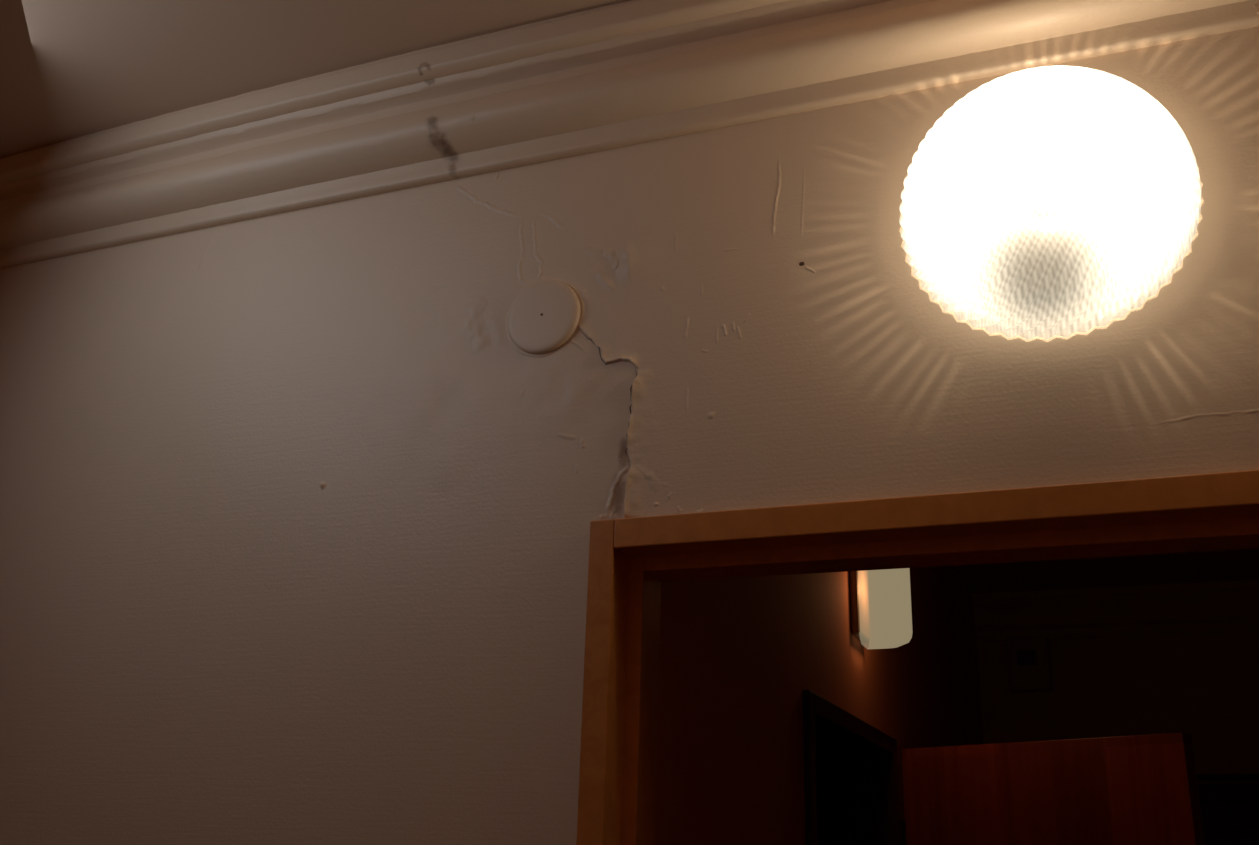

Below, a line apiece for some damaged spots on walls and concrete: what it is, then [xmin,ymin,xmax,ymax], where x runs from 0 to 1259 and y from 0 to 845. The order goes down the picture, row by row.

peeling [570,319,665,518]